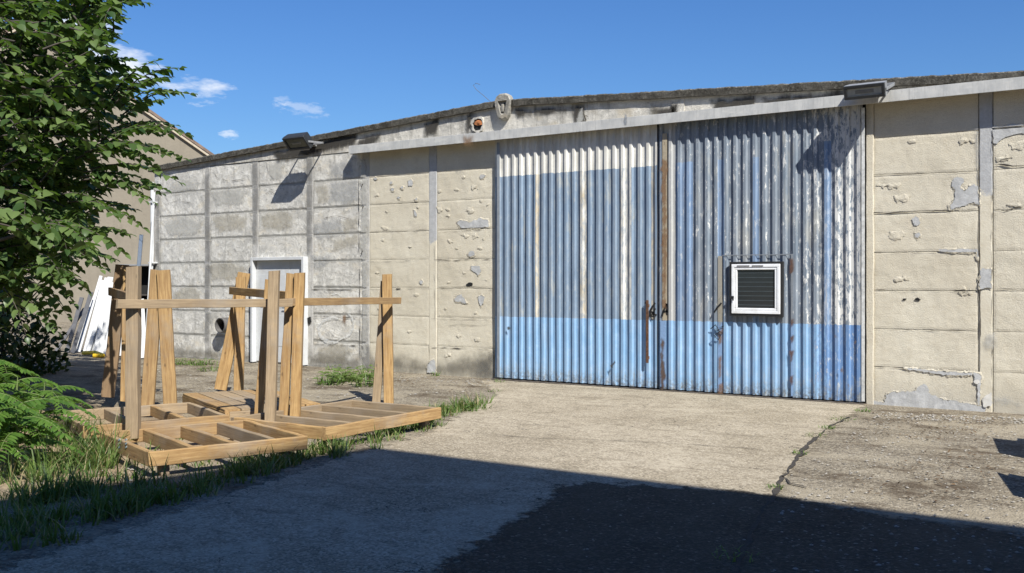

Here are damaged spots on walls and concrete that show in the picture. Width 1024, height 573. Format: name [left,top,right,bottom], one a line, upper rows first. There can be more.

peeling [992,124,1024,144]
peeling [947,177,982,211]
peeling [939,247,993,290]
peeling [874,366,987,412]